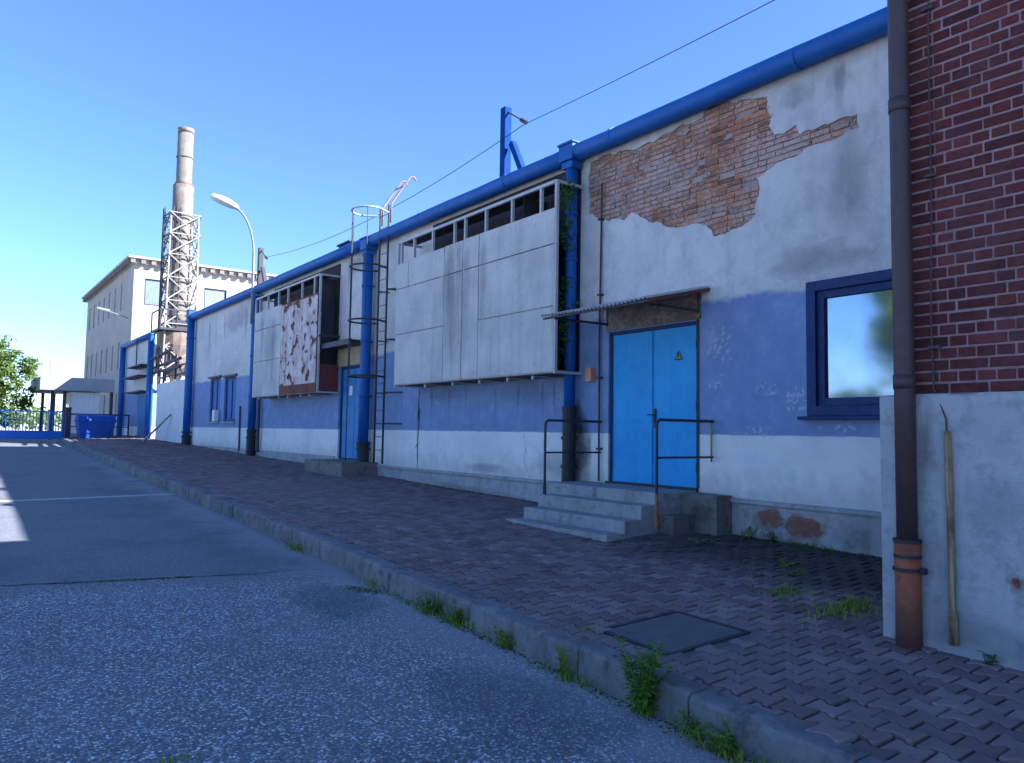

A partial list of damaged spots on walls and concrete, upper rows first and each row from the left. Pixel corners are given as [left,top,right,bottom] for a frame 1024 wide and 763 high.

spalling [589,93,859,236]
spalling [757,509,825,538]